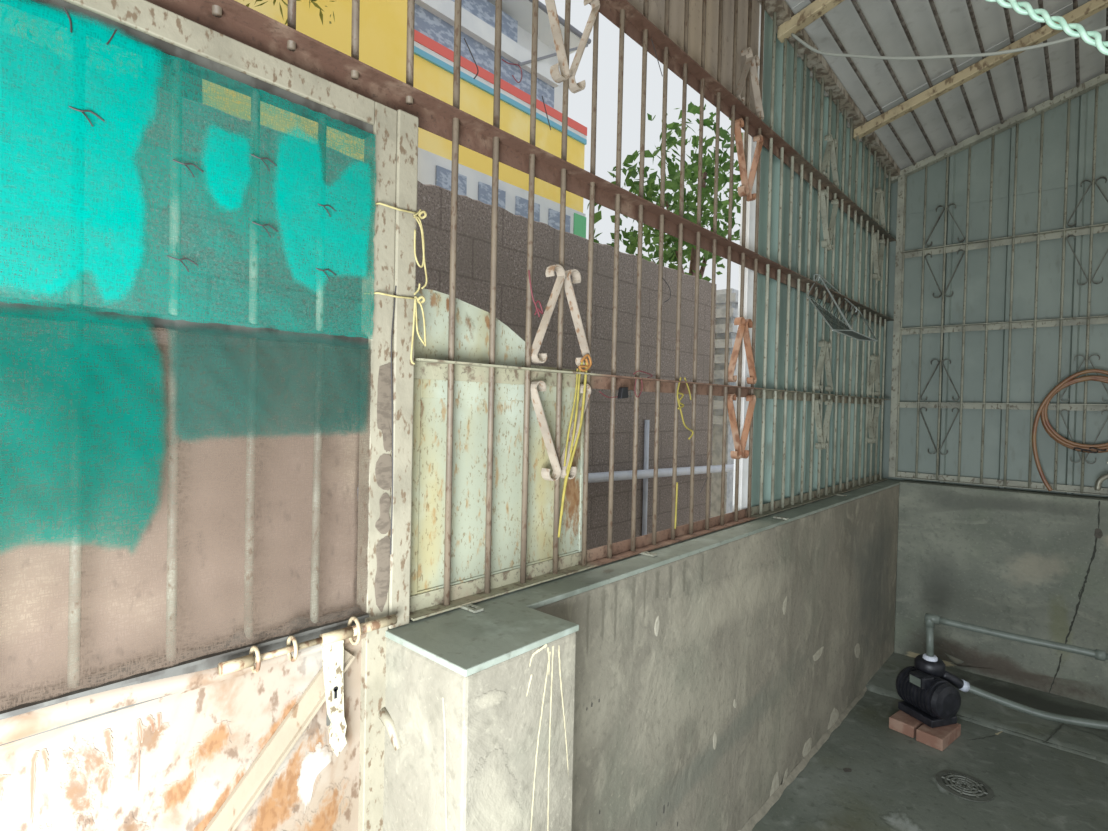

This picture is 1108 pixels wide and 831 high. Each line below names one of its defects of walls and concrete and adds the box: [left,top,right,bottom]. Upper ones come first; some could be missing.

peeling [375,362,394,612]
rust [560,414,581,546]
crack [1049,501,1103,693]
rust [29,728,116,831]
rust [114,812,150,831]
rust [133,713,169,790]
rust [159,720,231,816]
rust [193,684,307,831]
rust [244,712,350,831]
peeling [296,742,332,814]
damp [880,809,924,831]